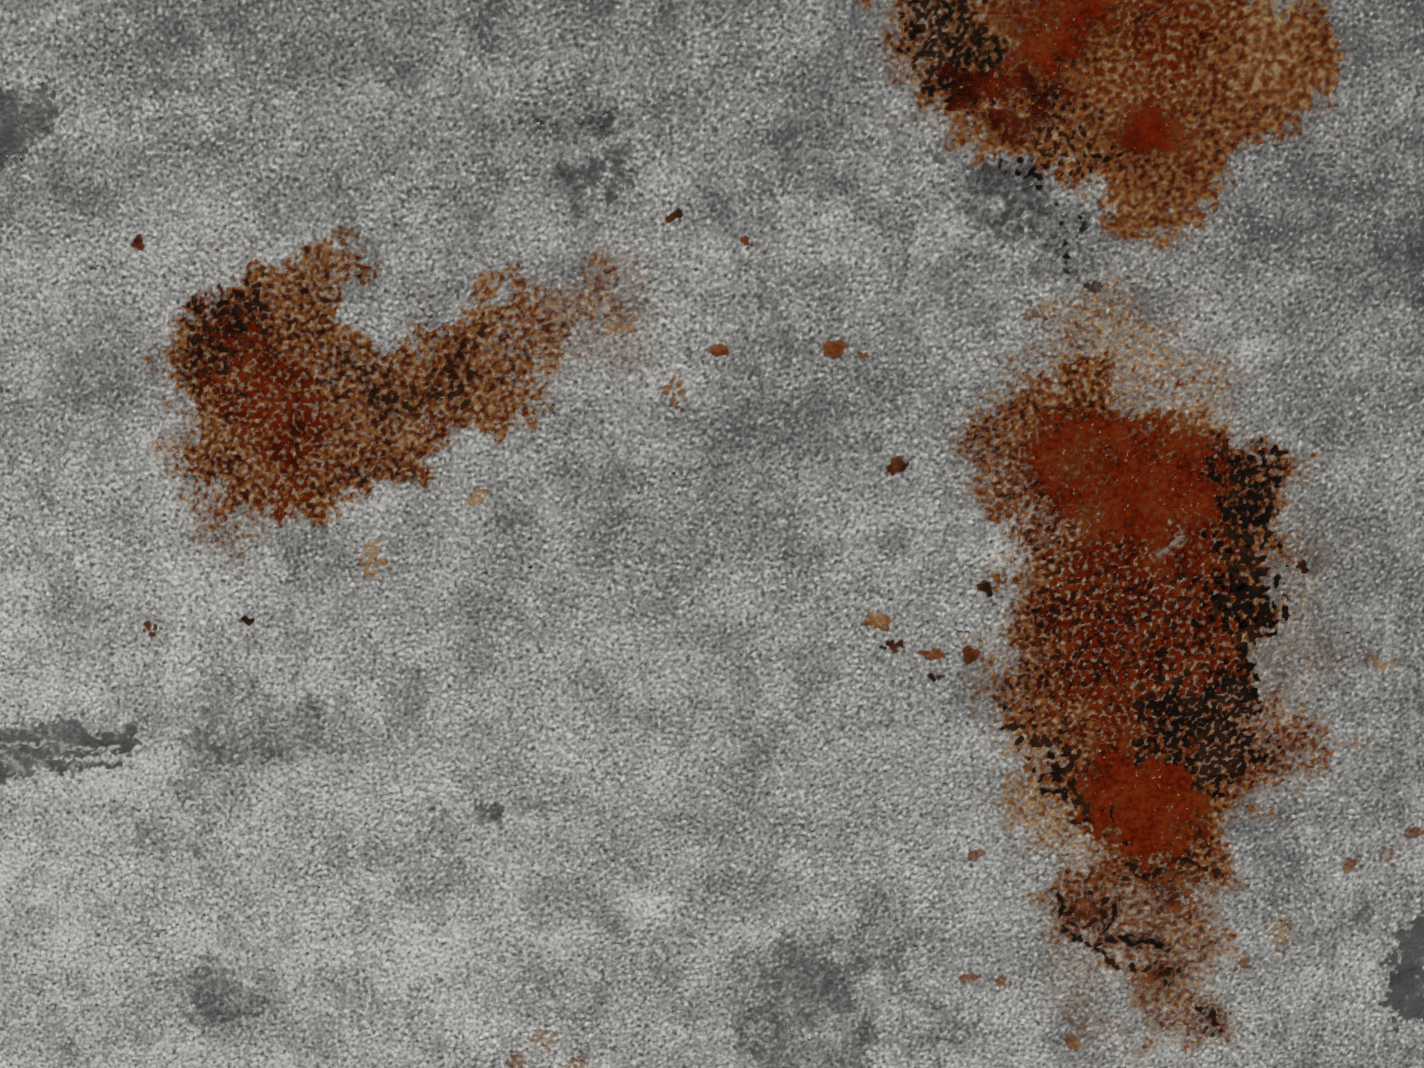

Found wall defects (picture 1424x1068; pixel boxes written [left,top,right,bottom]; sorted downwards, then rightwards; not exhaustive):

corrosion [881,0,1344,252]
corrosion [145,226,646,556]
corrosion [886,456,909,475]
corrosion [863,612,903,653]
corrosion [919,649,945,682]
corrosion [957,278,1369,1058]